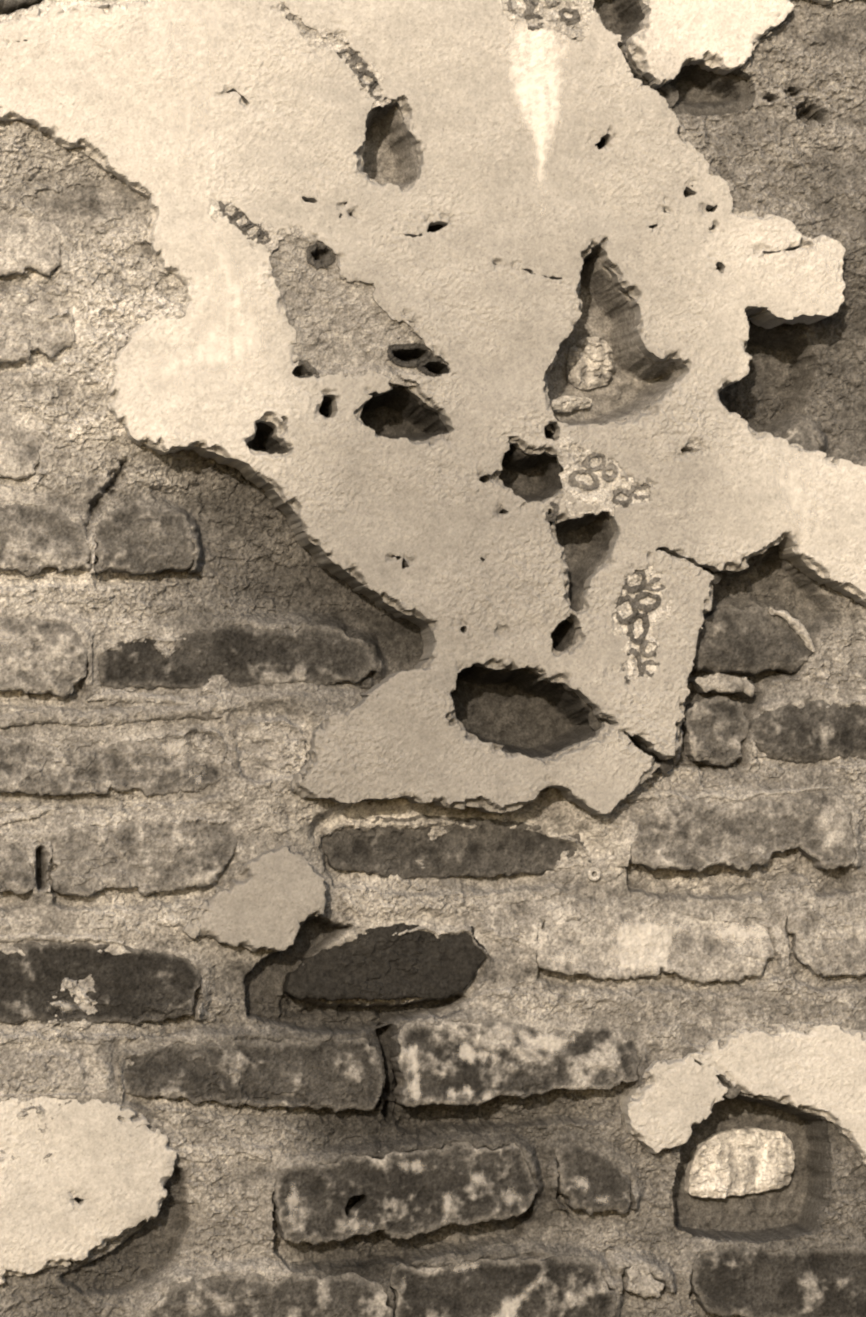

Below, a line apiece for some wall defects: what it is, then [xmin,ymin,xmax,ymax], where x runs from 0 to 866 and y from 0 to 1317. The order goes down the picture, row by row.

peeling [0,0,866,816]
peeling [182,841,327,952]
peeling [0,1096,177,1285]
peeling [620,1023,866,1199]